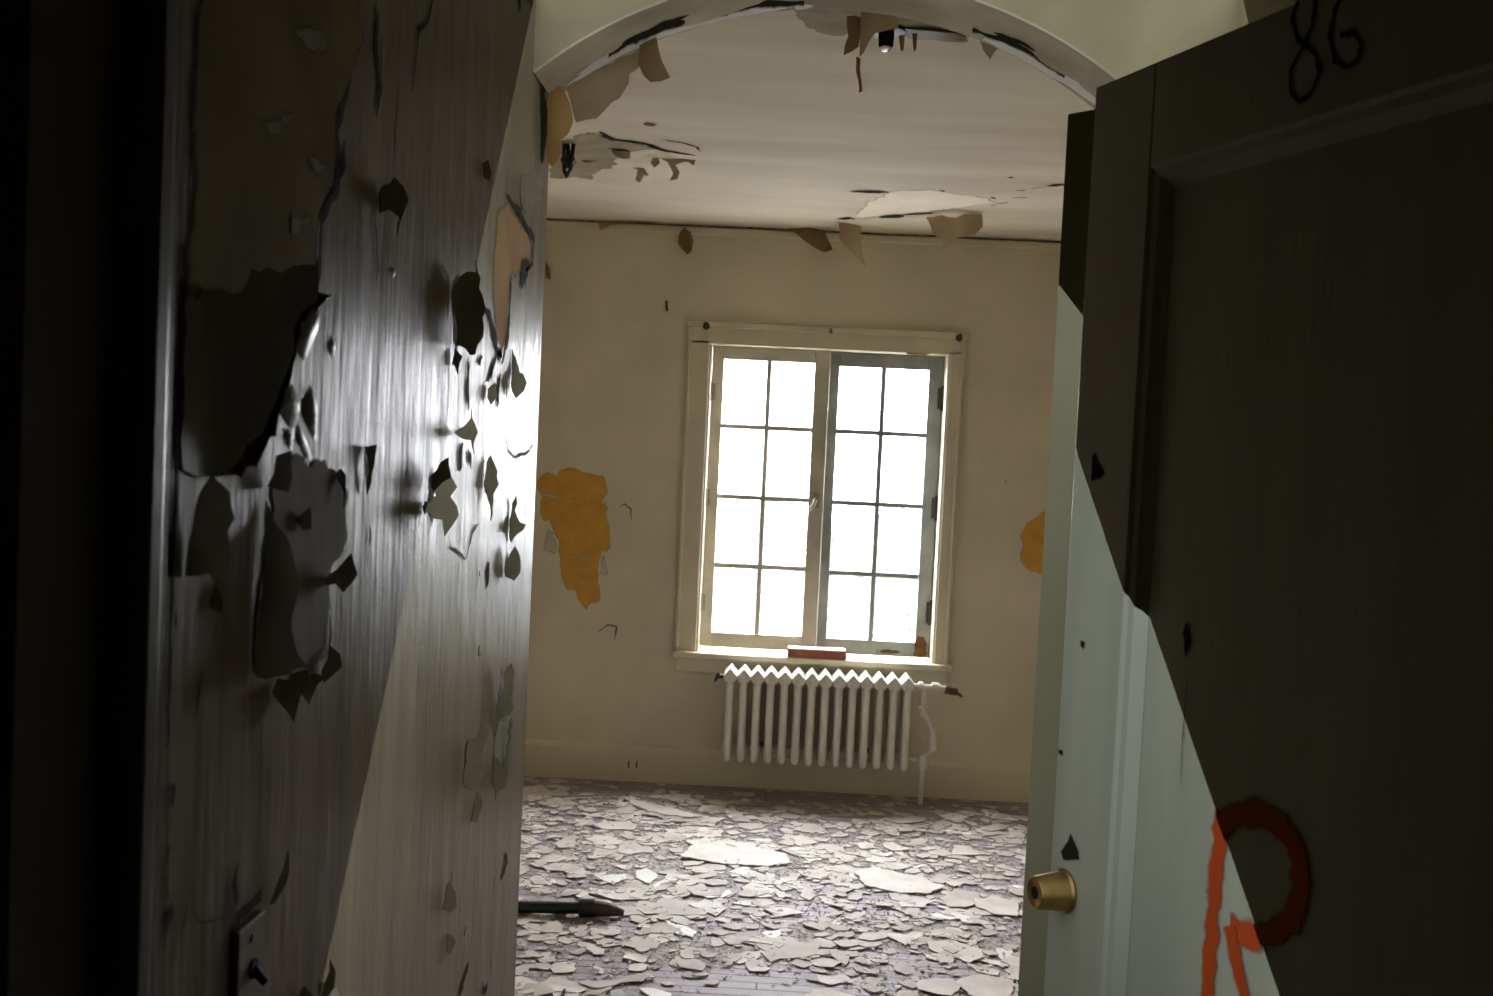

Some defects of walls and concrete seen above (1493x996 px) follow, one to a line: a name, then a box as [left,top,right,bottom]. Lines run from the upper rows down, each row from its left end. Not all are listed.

peeling [541,0,1096,182]
peeling [379,177,409,235]
peeling [678,227,694,254]
peeling [790,177,1064,267]
peeling [451,194,551,404]
peeling [365,445,377,494]
peeling [423,458,459,536]
peeling [454,409,499,520]
peeling [505,497,525,581]
peeling [537,468,611,609]
peeling [1020,512,1045,574]
peeling [298,959,340,996]